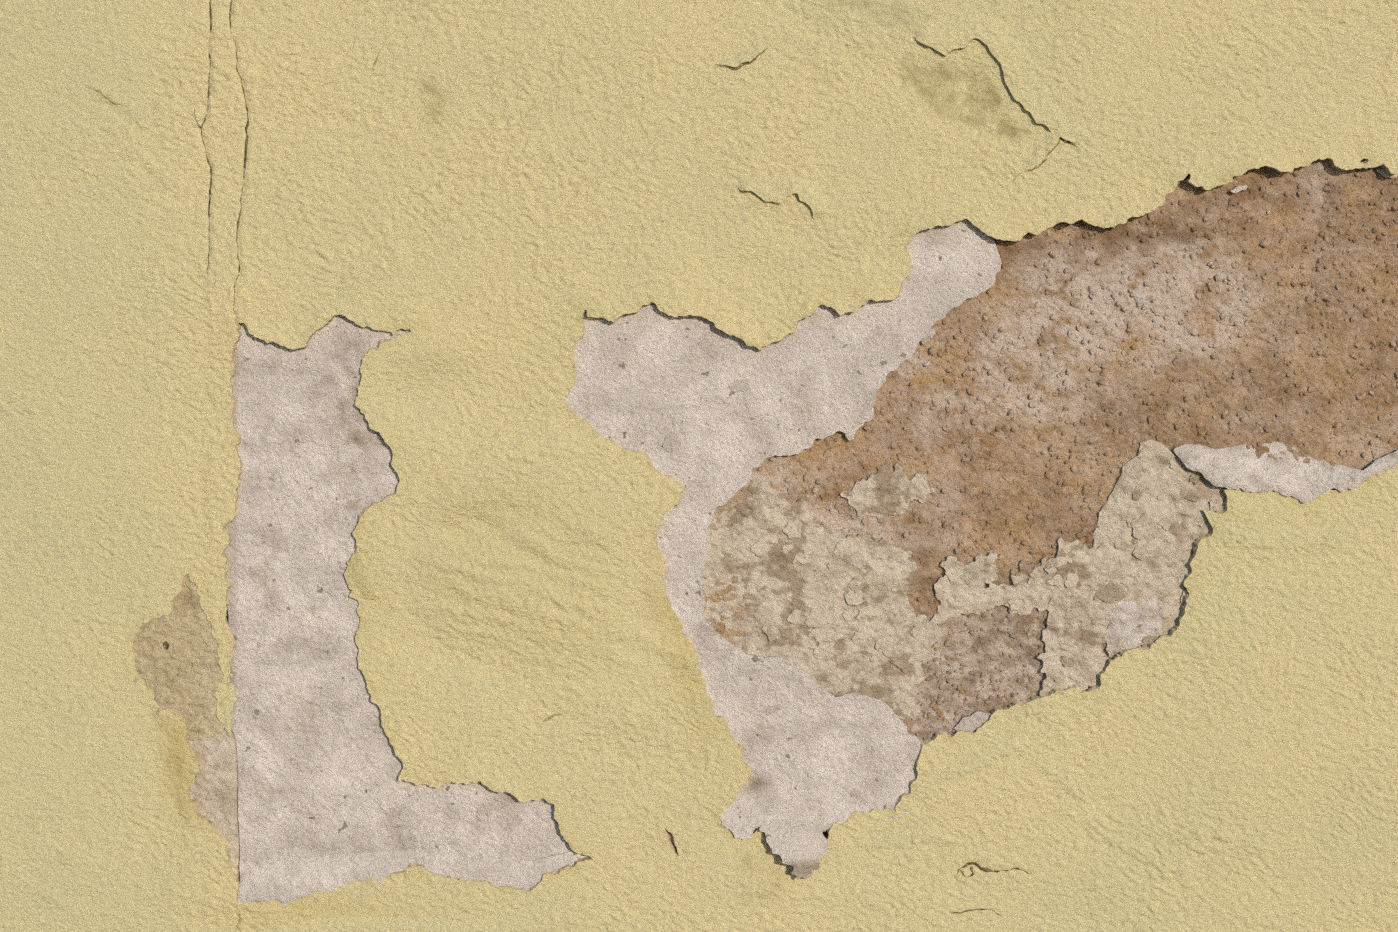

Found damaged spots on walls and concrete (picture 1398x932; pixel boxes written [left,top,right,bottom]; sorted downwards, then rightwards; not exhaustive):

crack [194,0,249,322]
peeling [913,12,1087,181]
peeling [133,315,590,907]
peeling [565,159,1398,880]